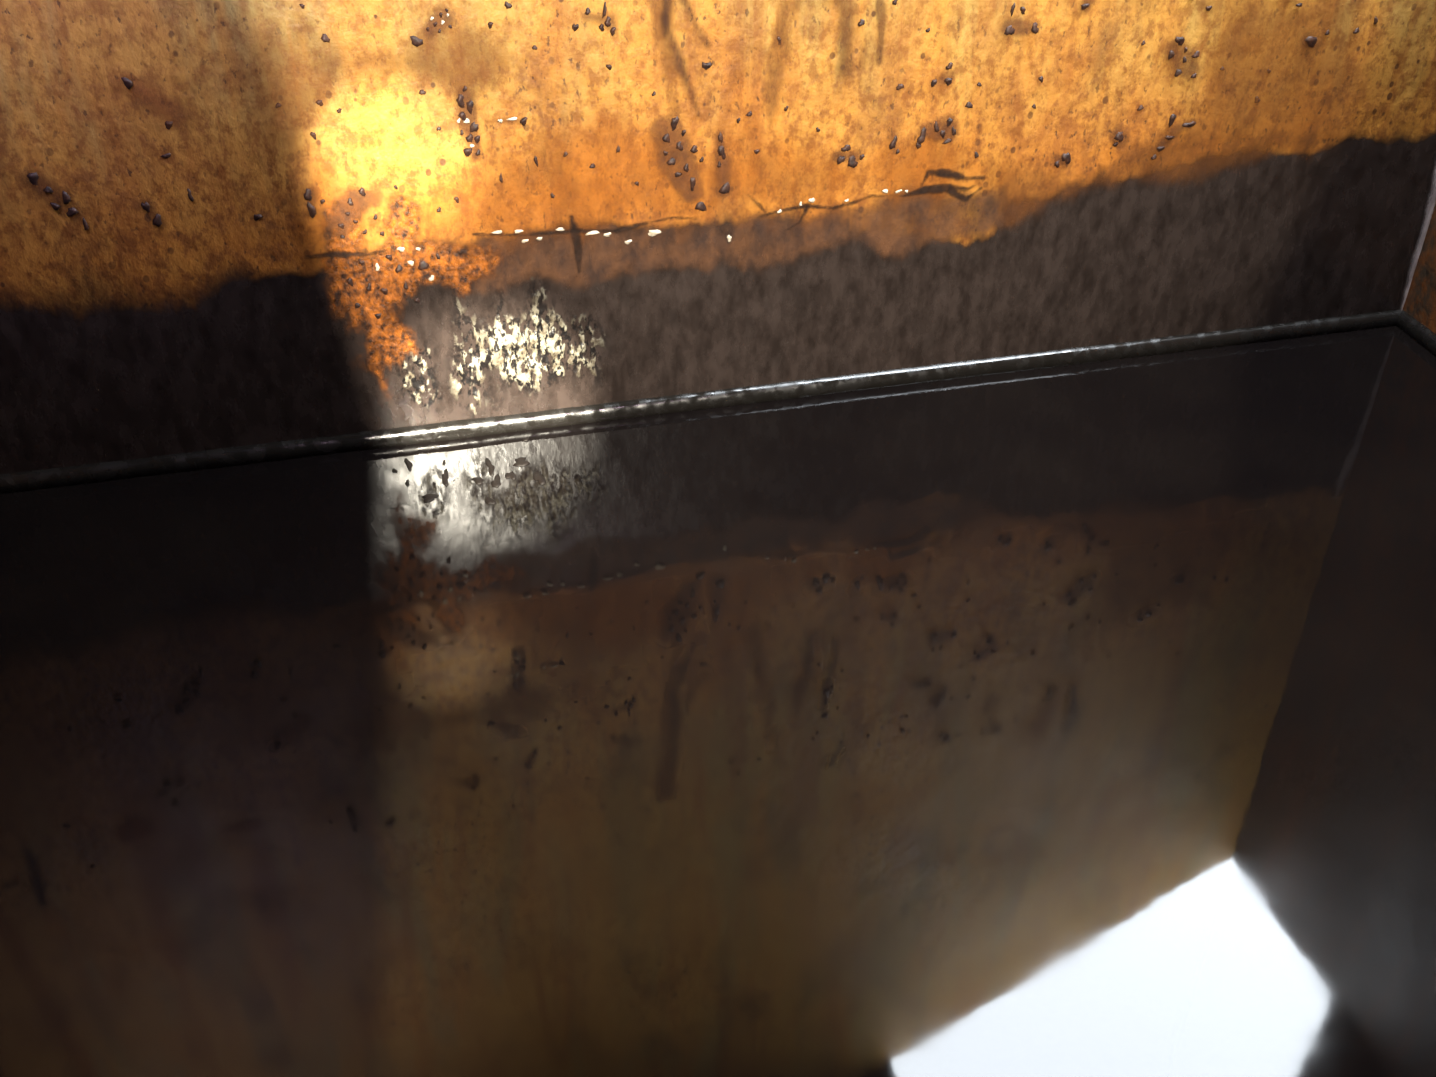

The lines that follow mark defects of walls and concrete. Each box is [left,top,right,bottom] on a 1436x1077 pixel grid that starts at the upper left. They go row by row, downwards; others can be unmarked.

crack [759,201,856,219]
crack [904,169,985,201]
crack [473,216,672,270]
leakage [0,133,1436,474]